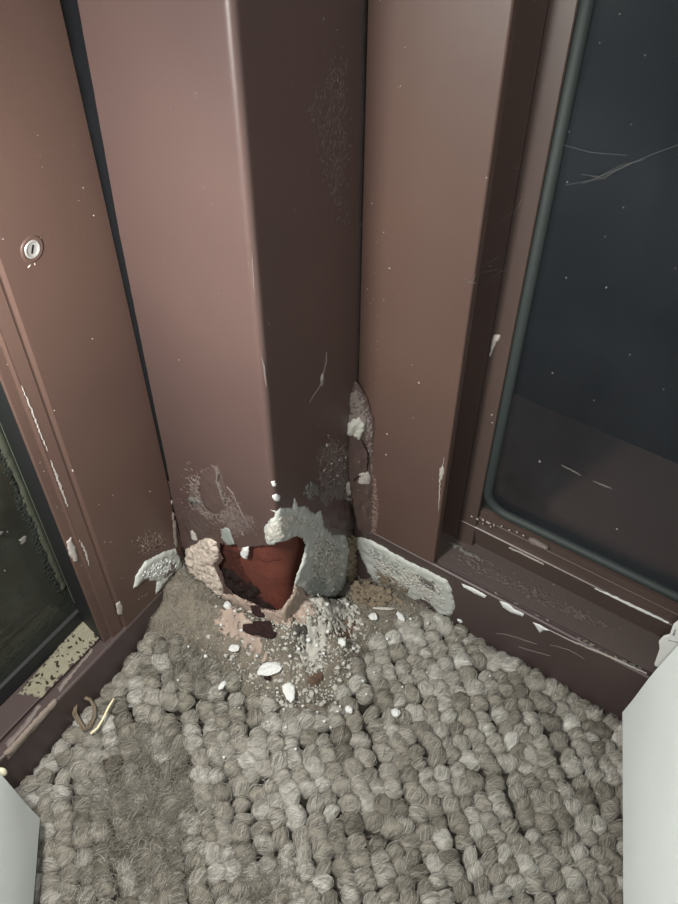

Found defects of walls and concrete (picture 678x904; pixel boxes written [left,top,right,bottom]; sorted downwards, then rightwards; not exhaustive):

crack [354,438,369,481]
peeling [346,472,371,501]
peeling [66,537,79,562]
peeling [133,500,182,594]
peeling [220,527,250,559]
peeling [264,481,486,623]